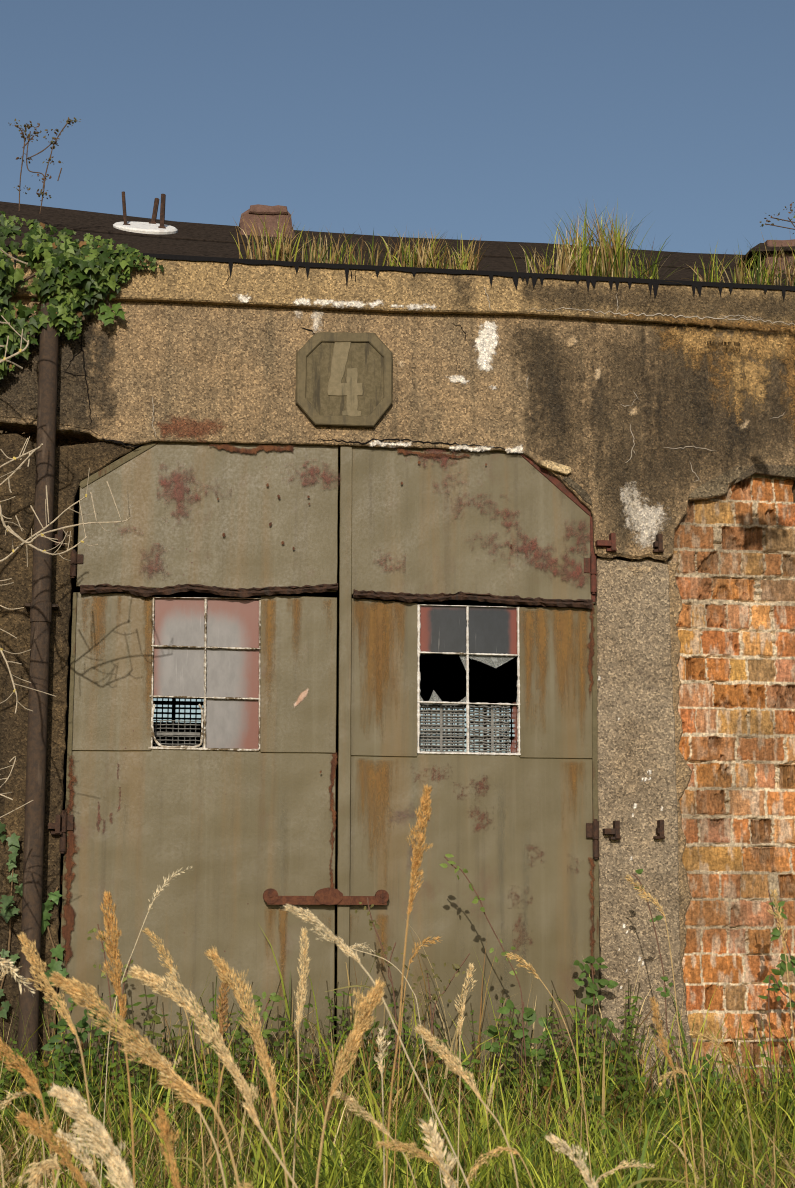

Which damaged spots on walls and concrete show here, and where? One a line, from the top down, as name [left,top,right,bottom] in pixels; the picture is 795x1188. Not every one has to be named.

water stain [520,281,795,547]
spalling [676,466,777,629]
rust [80,583,338,700]
rust [353,589,595,711]
spalling [684,657,795,709]
spalling [688,735,737,763]
spalling [777,763,795,789]
spalling [741,846,791,873]